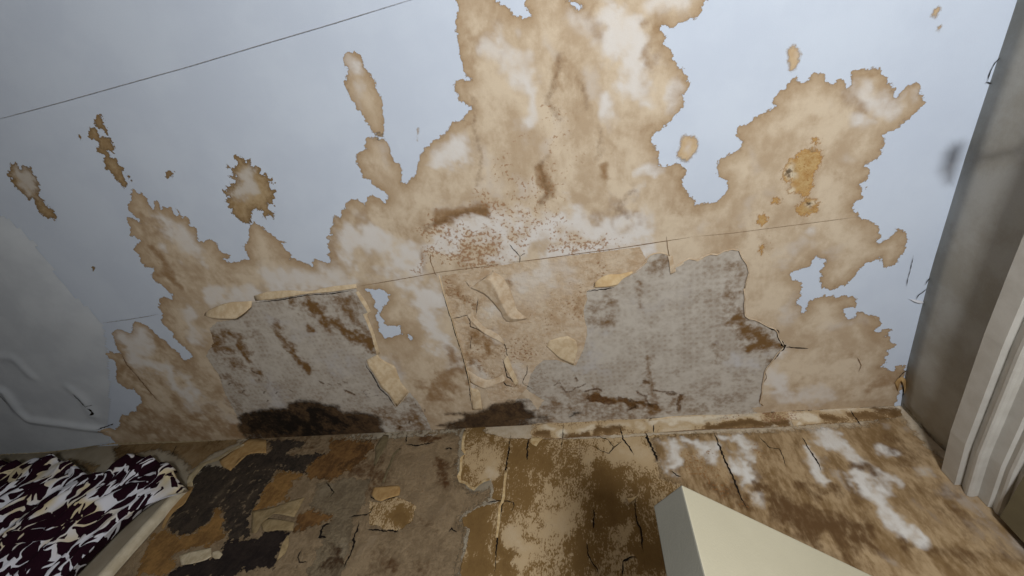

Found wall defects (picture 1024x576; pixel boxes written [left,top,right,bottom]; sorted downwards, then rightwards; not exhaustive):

leakage [88,114,132,187]
leakage [7,162,57,221]
leakage [98,0,926,469]
peeling [516,249,784,446]
peeling [114,284,491,576]
leakage [305,437,375,482]
crack [489,422,564,571]
crack [593,418,681,477]
crack [714,434,747,508]
leakage [439,387,1024,576]
crack [760,438,821,469]
leakage [136,507,229,576]